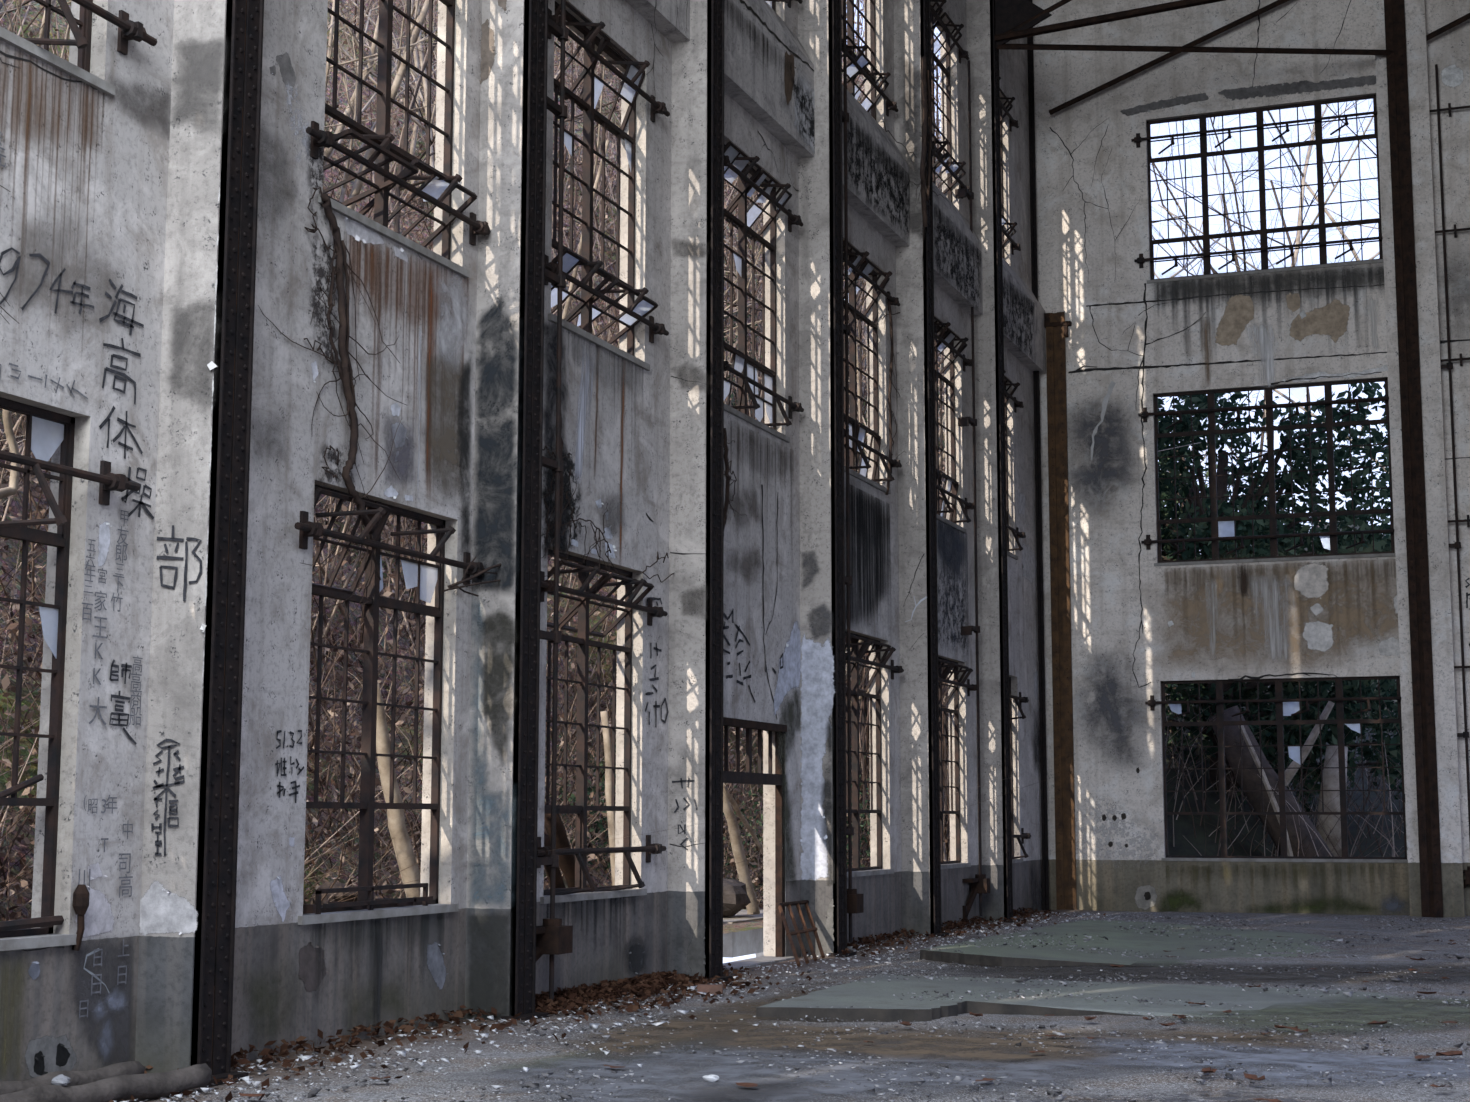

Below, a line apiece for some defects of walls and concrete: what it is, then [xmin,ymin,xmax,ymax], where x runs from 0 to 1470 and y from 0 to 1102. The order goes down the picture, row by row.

rust [12,64,93,186]
rust [349,243,468,472]
peeling [1215,294,1254,346]
leakage [1159,268,1384,347]
peeling [1286,293,1350,343]
leakage [1074,409,1131,496]
leakage [1169,565,1398,660]
peeling [1294,563,1334,652]